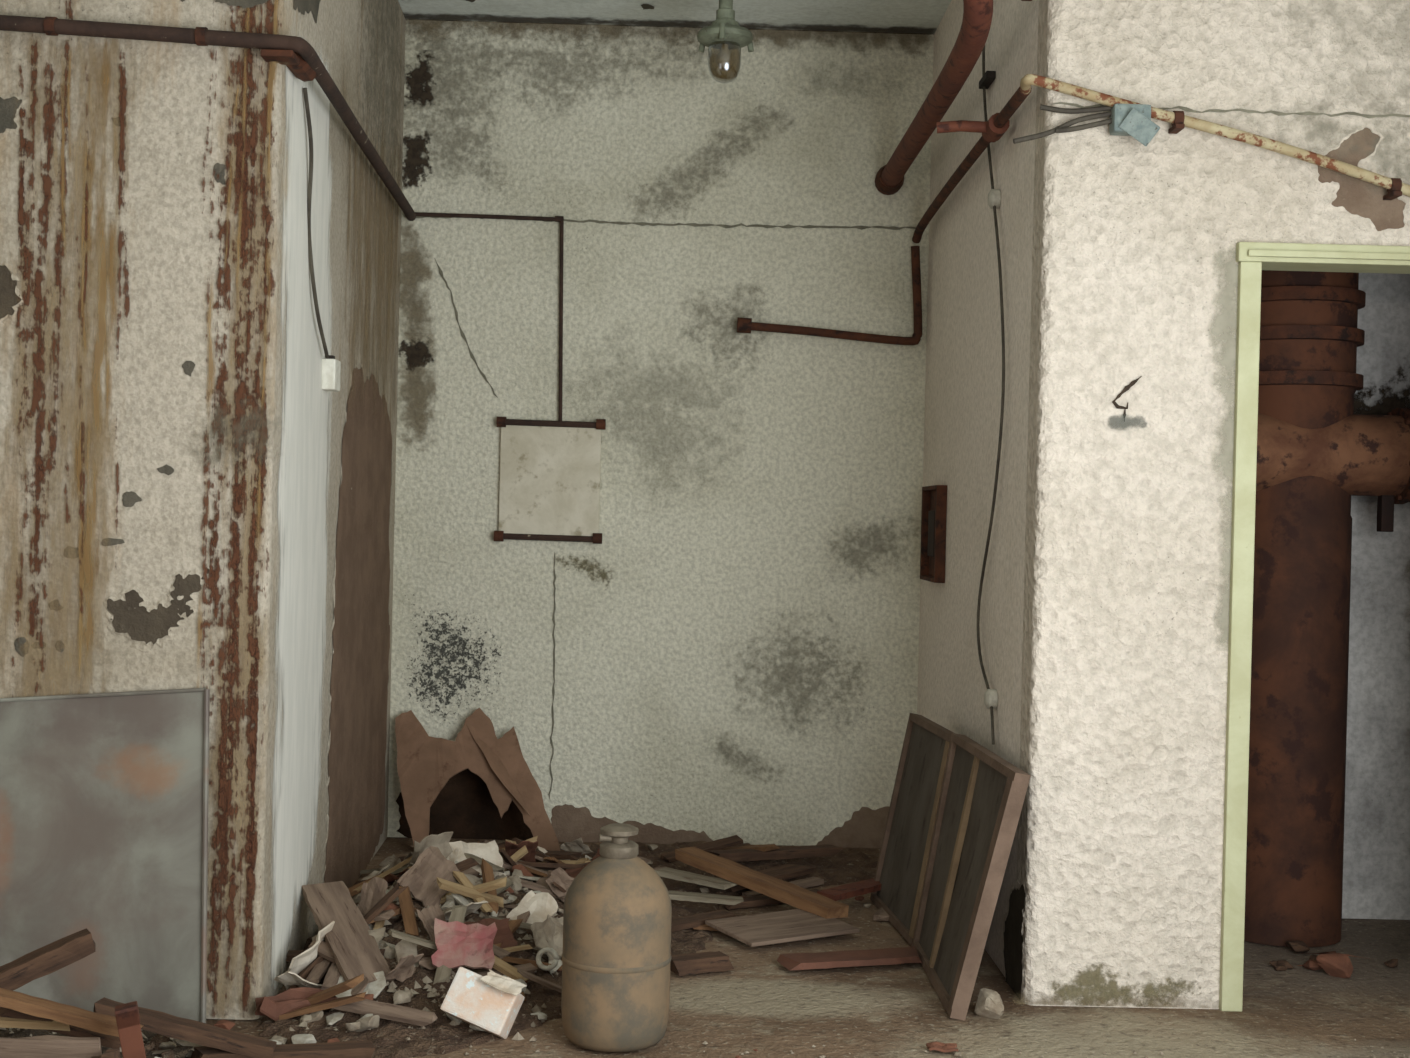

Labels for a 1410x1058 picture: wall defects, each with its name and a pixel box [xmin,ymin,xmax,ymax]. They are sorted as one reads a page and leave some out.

crack [1054,101,1104,109]
crack [1159,106,1410,118]
crack [544,219,916,230]
spalling [1311,121,1410,240]
corrosion [0,38,130,697]
crack [435,260,498,398]
corrosion [198,0,286,1018]
spalling [102,562,217,653]
spalling [323,359,412,888]
damp [400,589,501,734]
spalling [429,769,533,841]
spalling [540,788,715,844]